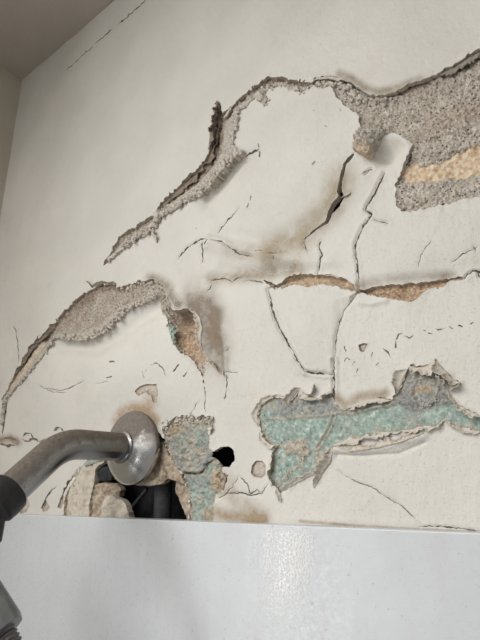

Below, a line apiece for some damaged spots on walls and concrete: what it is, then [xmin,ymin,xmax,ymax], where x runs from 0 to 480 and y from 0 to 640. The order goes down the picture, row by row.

crack [68,0,146,68]
spalling [107,52,480,263]
crack [179,196,277,262]
spalling [0,280,224,425]
damp [187,296,223,356]
crack [207,170,480,402]
spalling [59,414,235,521]
crack [219,477,267,498]
peeling [250,358,480,502]
crack [343,474,476,531]